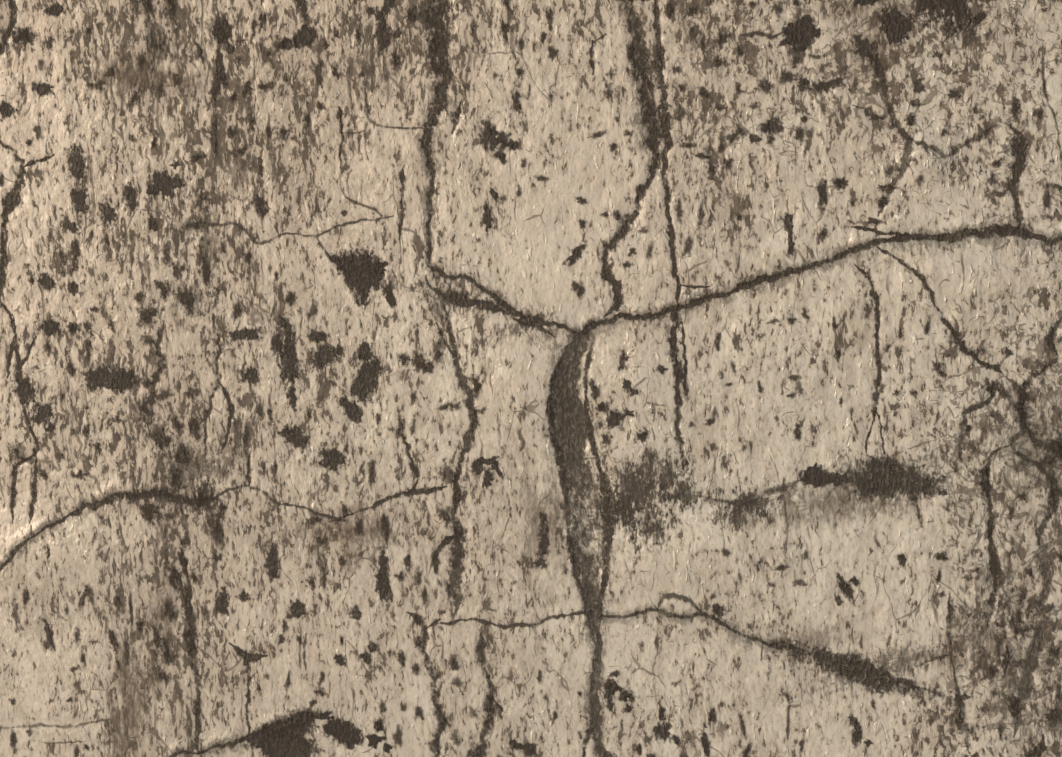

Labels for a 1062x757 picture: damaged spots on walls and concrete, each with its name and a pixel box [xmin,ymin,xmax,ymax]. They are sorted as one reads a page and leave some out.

crack [0,0,17,55]
crack [364,89,376,124]
crack [0,140,55,524]
crack [384,0,1062,757]
crack [0,418,447,571]
crack [170,549,313,757]
crack [0,718,110,743]